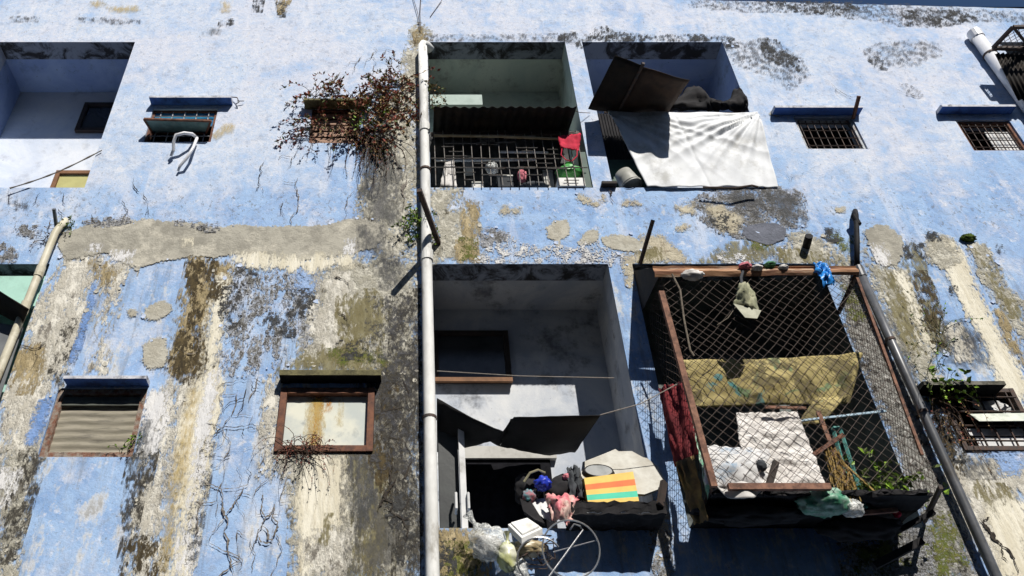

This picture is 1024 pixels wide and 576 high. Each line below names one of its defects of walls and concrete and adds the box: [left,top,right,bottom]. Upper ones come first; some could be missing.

water stain [863,40,942,69]
spalling [72,214,134,231]
spalling [173,219,234,233]
peeling [213,22,697,576]
water stain [687,186,809,238]
peeling [0,250,140,576]
water stain [136,255,236,576]
crack [194,378,289,576]
peeling [776,230,1024,576]